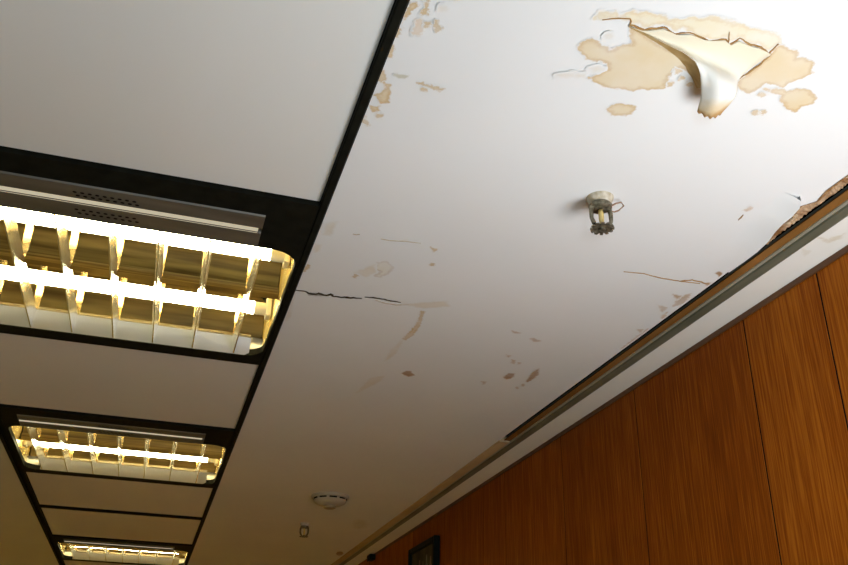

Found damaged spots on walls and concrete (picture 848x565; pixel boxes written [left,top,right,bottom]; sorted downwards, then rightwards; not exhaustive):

peeling [387,0,462,59]
peeling [362,69,393,127]
damp [605,103,638,117]
spalling [712,176,848,272]
crack [295,290,402,305]